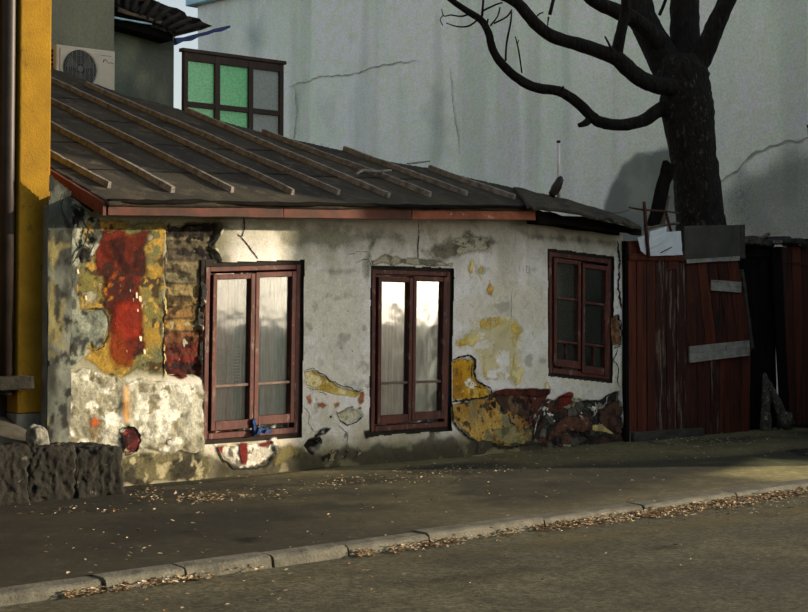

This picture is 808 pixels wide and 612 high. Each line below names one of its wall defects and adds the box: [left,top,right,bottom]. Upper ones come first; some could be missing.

crack [288,60,419,138]
crack [721,137,808,182]
crack [238,218,258,259]
peeling [69,199,224,456]
peeling [304,368,364,426]
peeling [452,354,547,425]